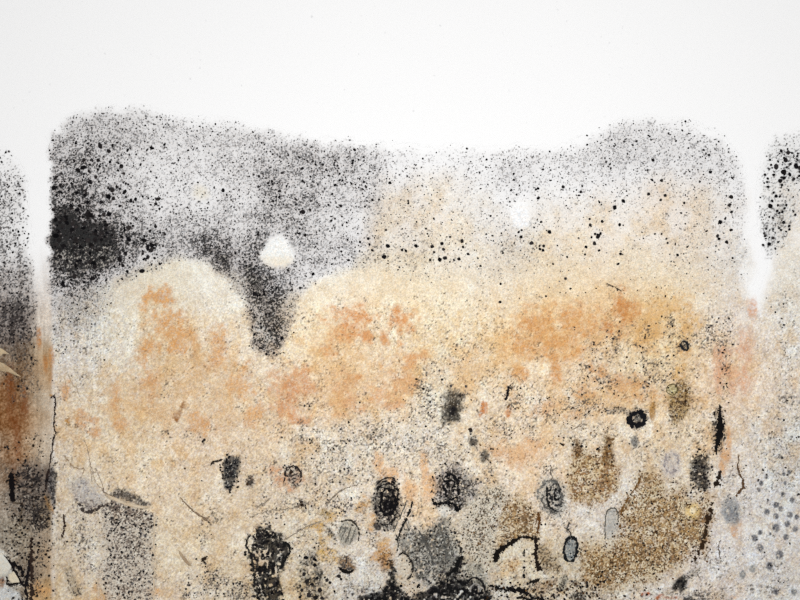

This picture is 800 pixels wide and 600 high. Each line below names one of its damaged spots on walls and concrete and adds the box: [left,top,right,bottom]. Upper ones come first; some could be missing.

leakage [383,495,437,560]
leakage [399,578,425,594]